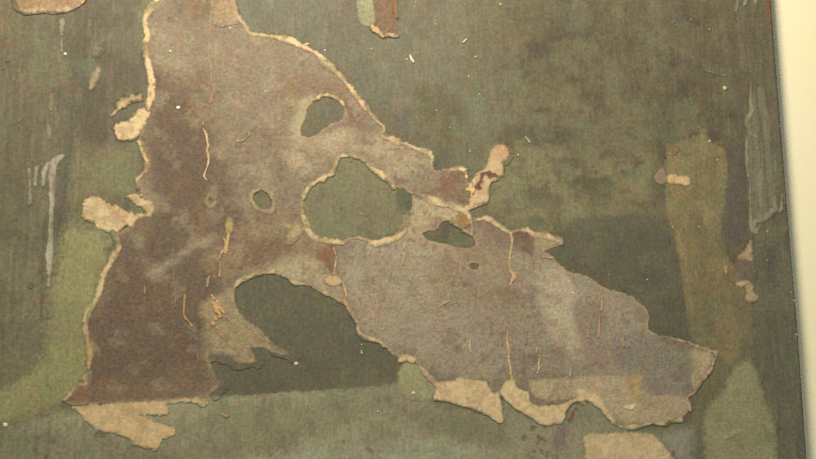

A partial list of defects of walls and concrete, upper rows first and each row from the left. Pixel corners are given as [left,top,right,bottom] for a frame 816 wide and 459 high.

peeling [109,92,153,142]
peeling [653,167,691,186]
peeling [80,192,154,235]
peeling [723,238,759,304]
peeling [210,294,226,329]
peeling [71,396,209,451]
peeling [433,376,674,459]